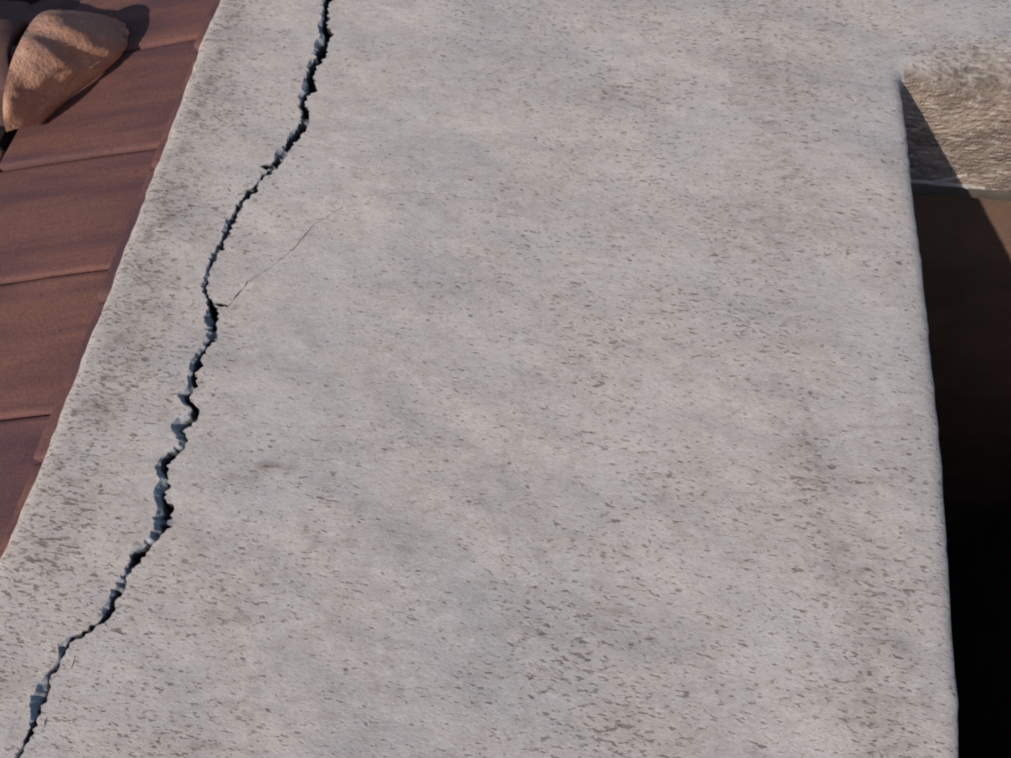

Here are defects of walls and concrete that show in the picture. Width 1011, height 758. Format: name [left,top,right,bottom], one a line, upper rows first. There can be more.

crack [15,0,494,758]